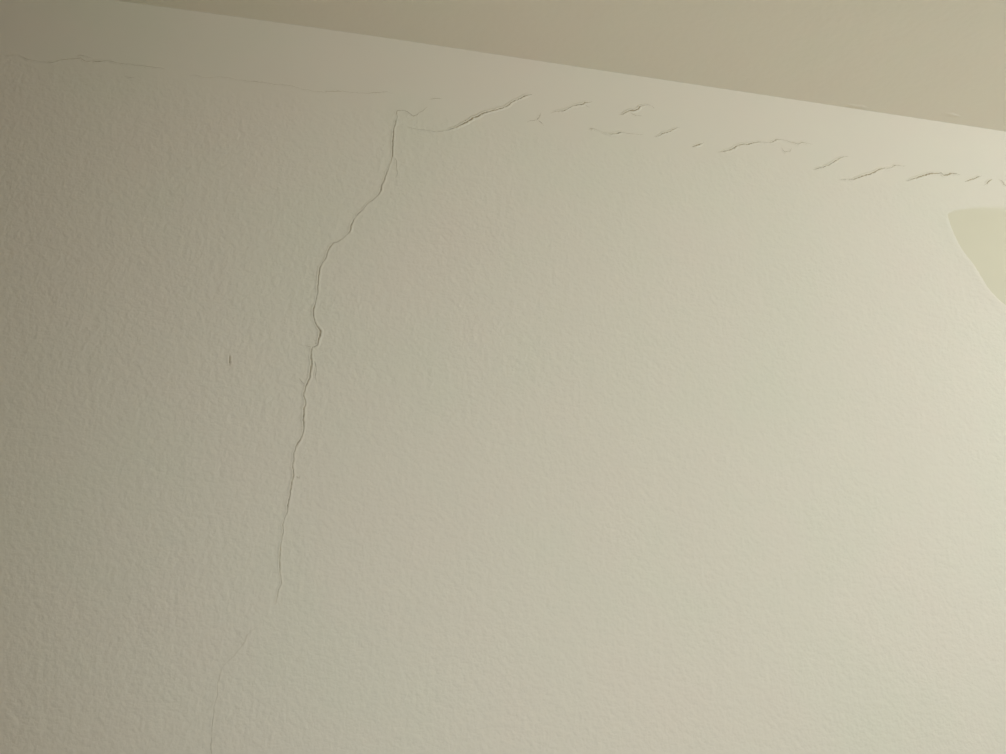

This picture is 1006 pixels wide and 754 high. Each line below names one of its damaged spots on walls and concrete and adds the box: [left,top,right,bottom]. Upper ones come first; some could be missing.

crack [274,93,533,605]
crack [550,100,1006,188]